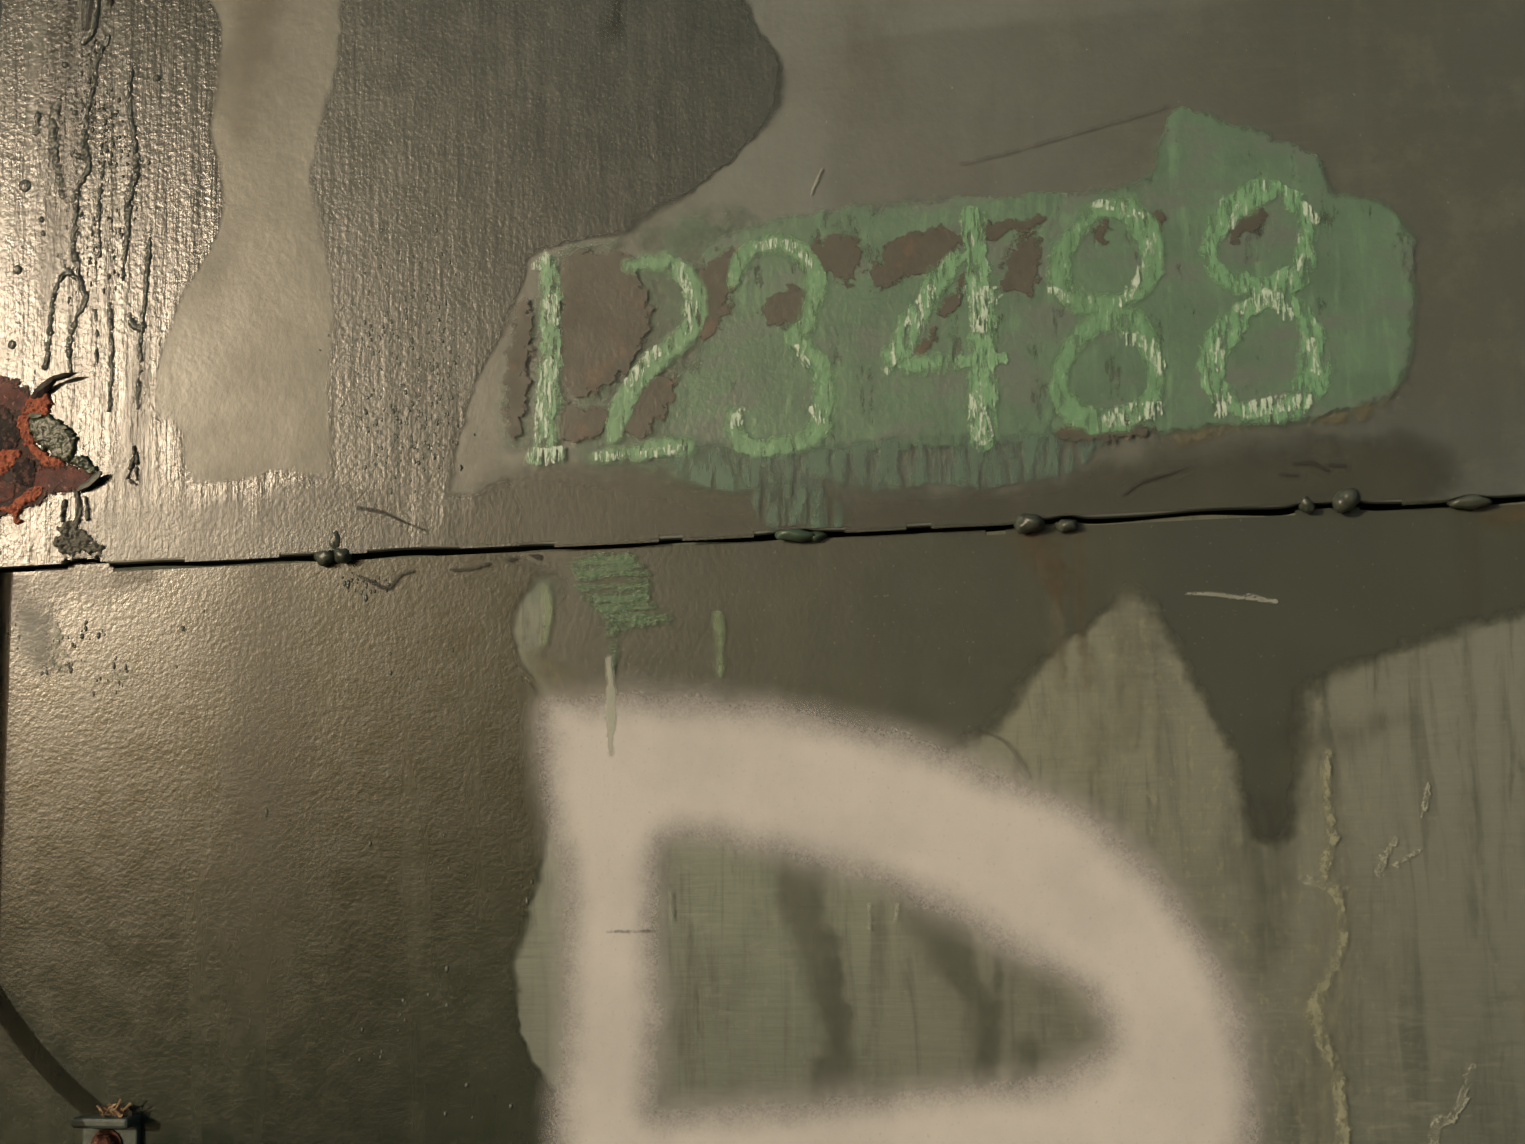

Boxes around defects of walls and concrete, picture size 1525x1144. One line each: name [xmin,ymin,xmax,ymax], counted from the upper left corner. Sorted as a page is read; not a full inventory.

corrosion [0,372,102,525]
corrosion [126,445,140,486]